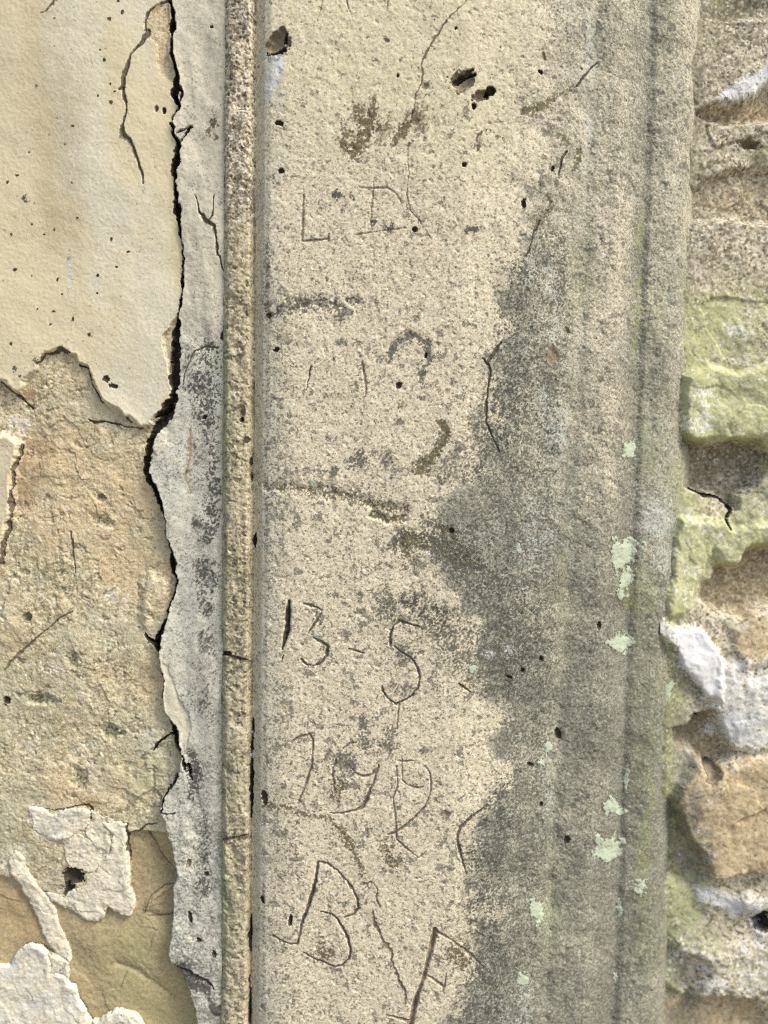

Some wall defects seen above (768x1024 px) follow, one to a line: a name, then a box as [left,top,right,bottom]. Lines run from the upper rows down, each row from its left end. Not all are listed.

leakage [556,132,583,172]
crack [0,443,24,564]
crack [36,0,224,916]
spalling [163,316,178,374]
crack [482,342,502,453]
crack [688,488,732,530]
leakage [259,198,570,1024]
spalling [0,351,197,1024]
leakage [574,559,612,818]